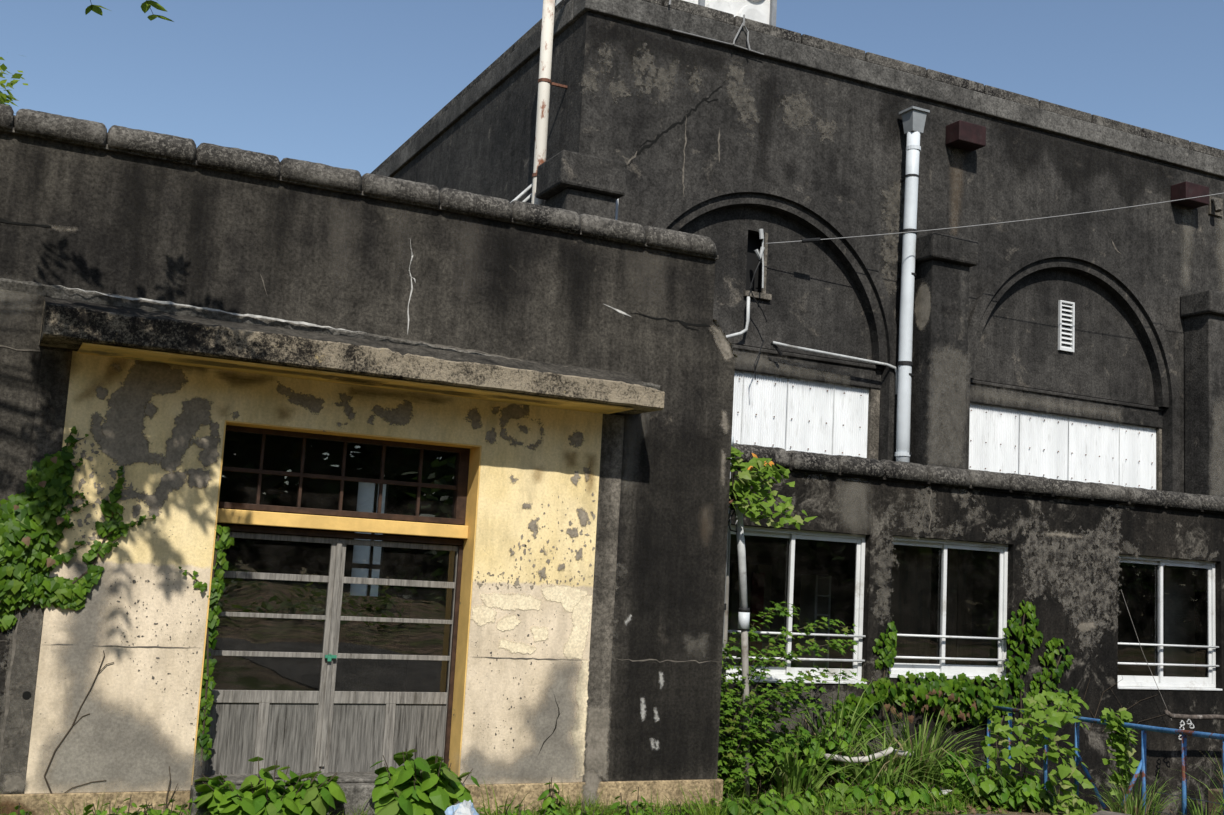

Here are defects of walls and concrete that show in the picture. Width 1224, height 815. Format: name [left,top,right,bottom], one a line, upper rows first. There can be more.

crack [627,80,726,194]
crack [407,239,415,335]
peeling [67,360,221,545]
peeling [277,381,413,429]
peeling [465,404,545,450]
peeling [568,430,583,449]
peeling [471,464,596,779]